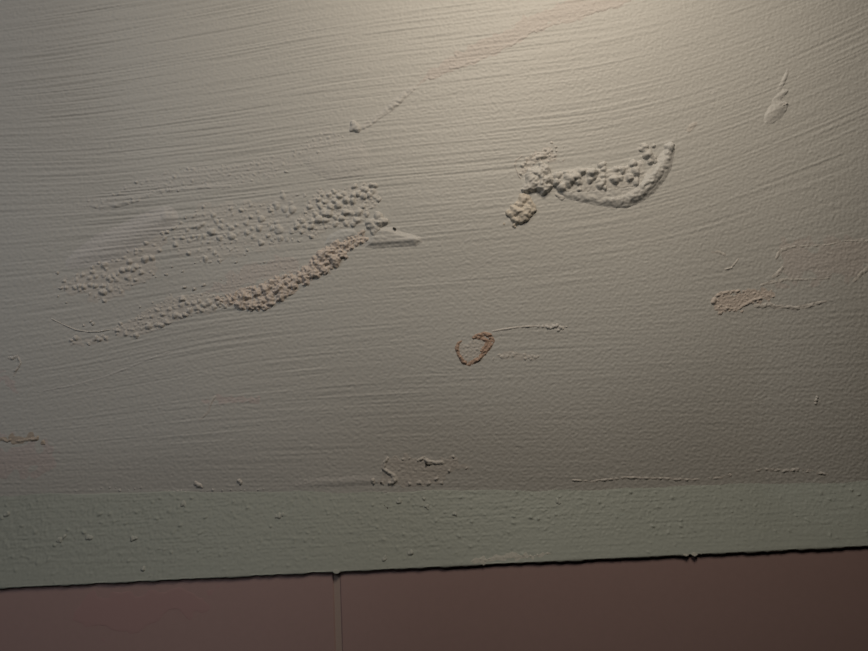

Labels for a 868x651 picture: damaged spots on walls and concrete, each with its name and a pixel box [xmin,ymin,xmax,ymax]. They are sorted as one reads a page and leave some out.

peeling [459,339,485,361]